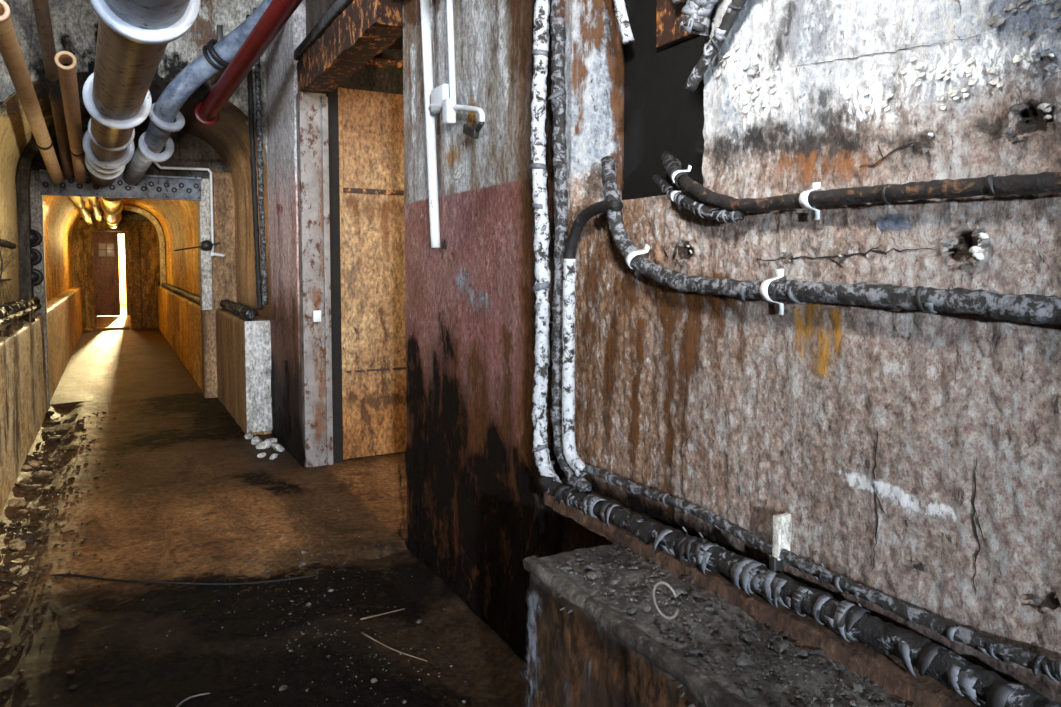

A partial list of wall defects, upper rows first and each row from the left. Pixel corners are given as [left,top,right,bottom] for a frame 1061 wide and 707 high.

peeling [985,0,1061,37]
peeling [846,45,1054,121]
spalling [1002,100,1055,143]
leakage [521,173,533,265]
corrosion [795,302,842,375]
corrosion [601,269,745,517]
leakage [87,278,563,666]
crack [972,457,984,595]
leakage [49,642,472,707]